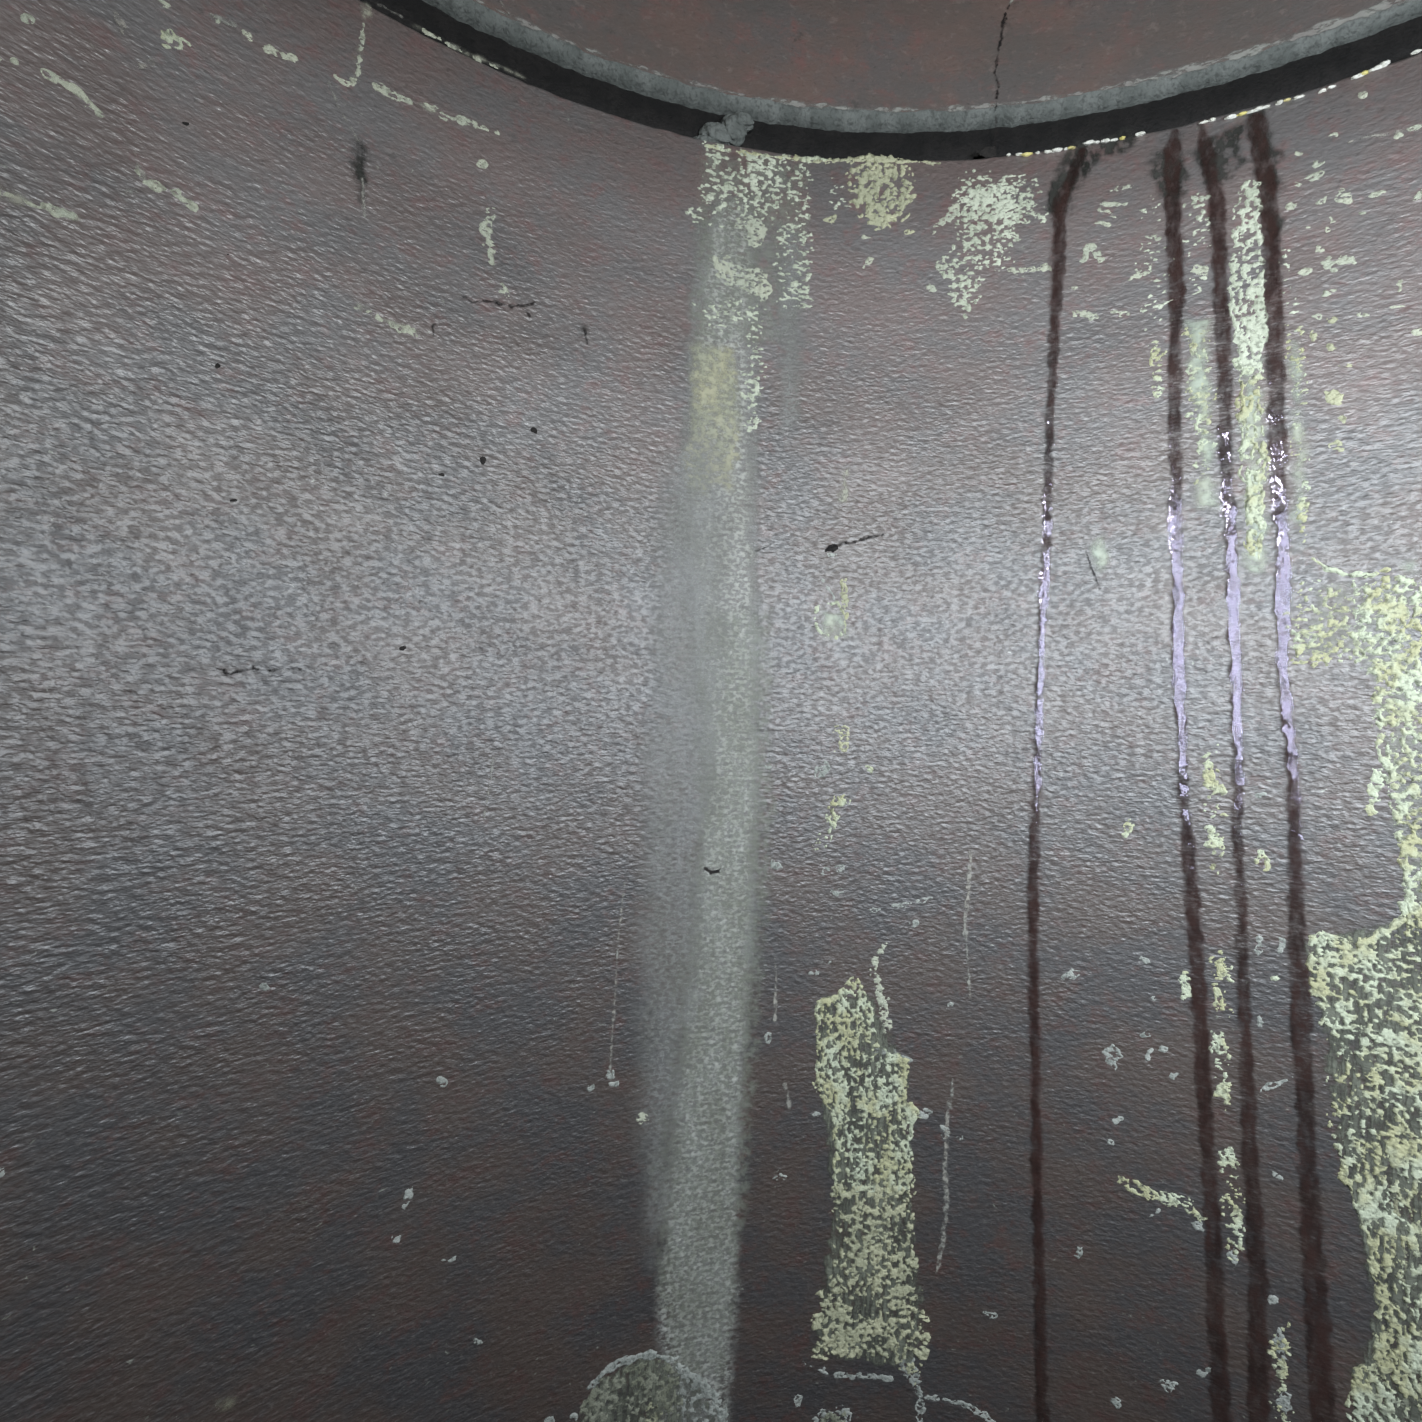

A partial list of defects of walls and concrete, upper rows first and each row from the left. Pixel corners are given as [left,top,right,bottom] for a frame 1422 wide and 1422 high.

crack [994,0,1013,148]
peeling [402,1186,413,1210]
peeling [586,1070,619,1092]
peeling [544,1349,729,1422]
water stain [645,141,941,1422]
peeling [805,943,963,1422]
water stain [926,60,1391,1422]
peeling [1282,557,1422,1422]